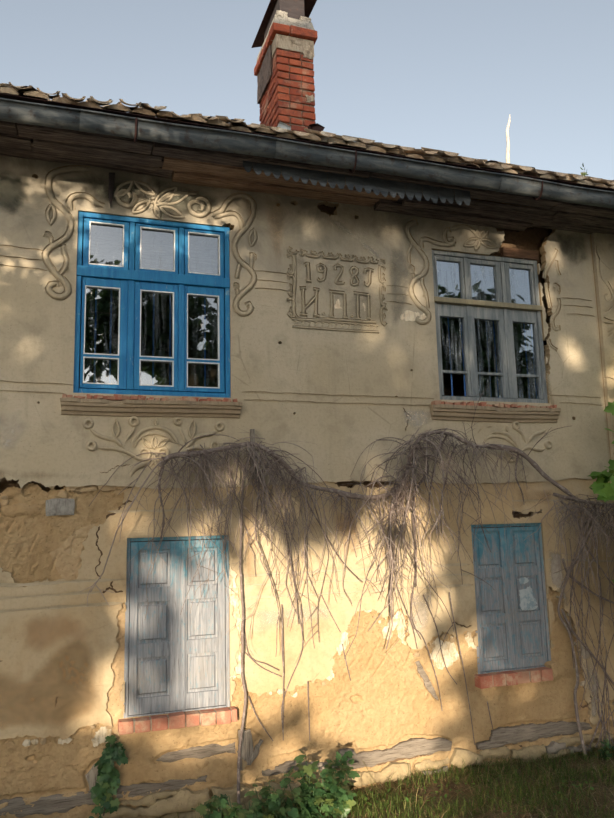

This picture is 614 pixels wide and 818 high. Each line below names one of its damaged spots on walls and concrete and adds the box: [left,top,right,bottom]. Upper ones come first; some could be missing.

flaking render [0,483,127,587]
crack [95,500,132,593]
damp [0,645,89,719]
flaking render [0,565,614,818]